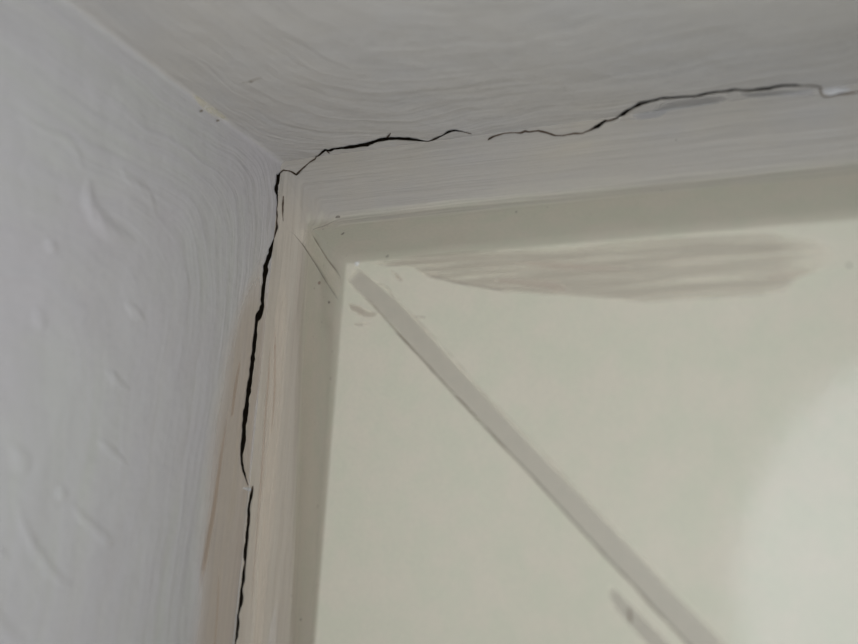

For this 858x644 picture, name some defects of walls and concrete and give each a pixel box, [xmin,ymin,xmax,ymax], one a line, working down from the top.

crack [235,84,858,644]